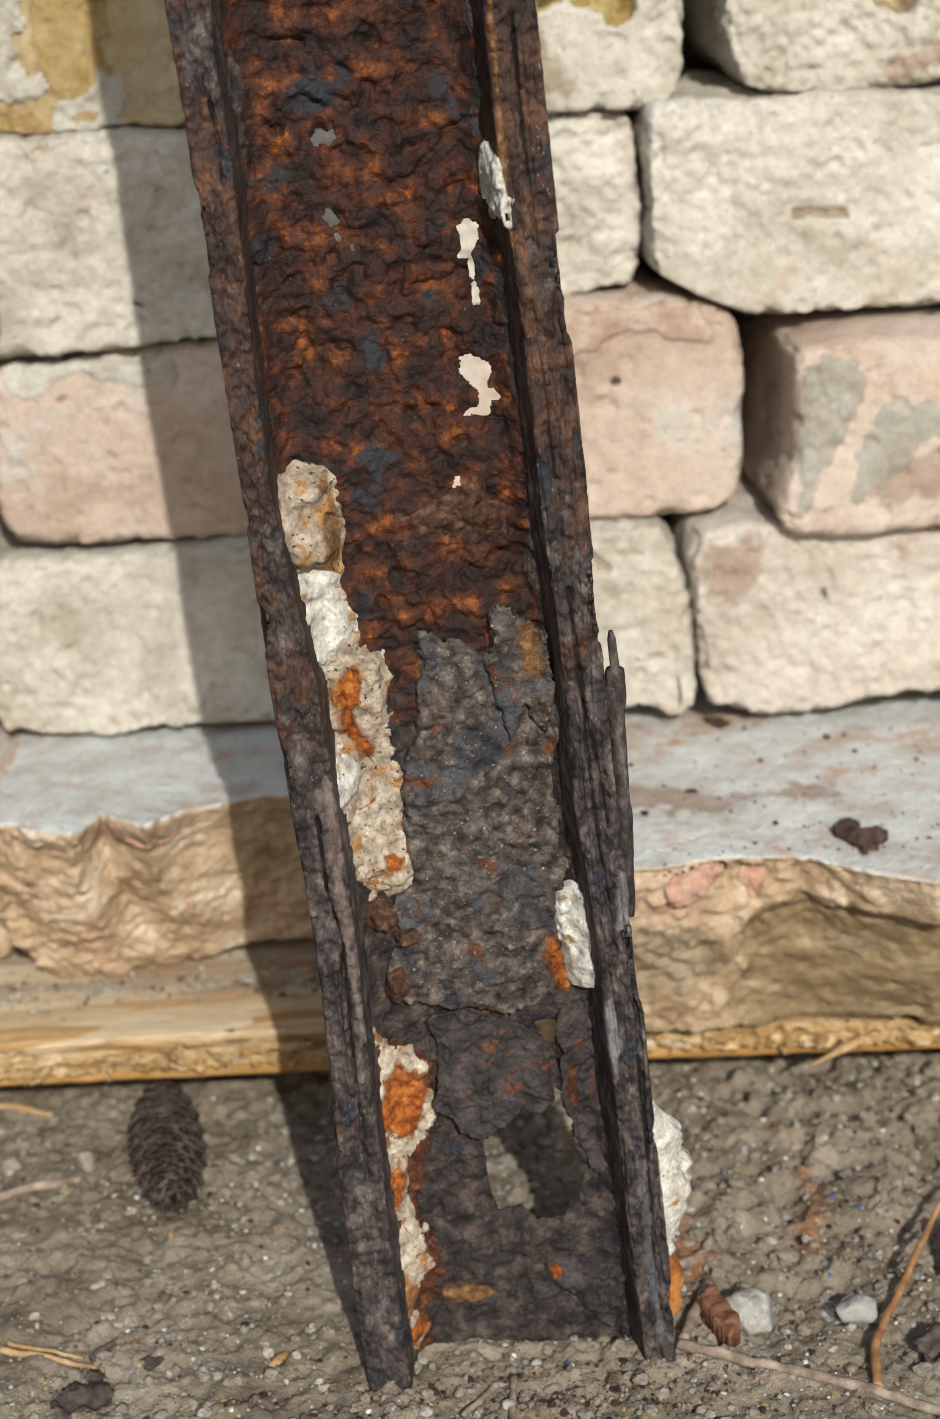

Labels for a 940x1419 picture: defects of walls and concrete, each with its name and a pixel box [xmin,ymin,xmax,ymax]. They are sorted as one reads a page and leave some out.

spalling [535,0,637,27]
peeling [0,0,126,133]
rust [486,0,509,205]
rust [317,468,342,567]
rust [393,475,507,543]
peeling [482,610,555,745]
rust [518,619,544,679]
rust [384,853,405,872]
rust [376,934,607,1172]
rust [398,1129,496,1354]
rust [543,1255,628,1330]